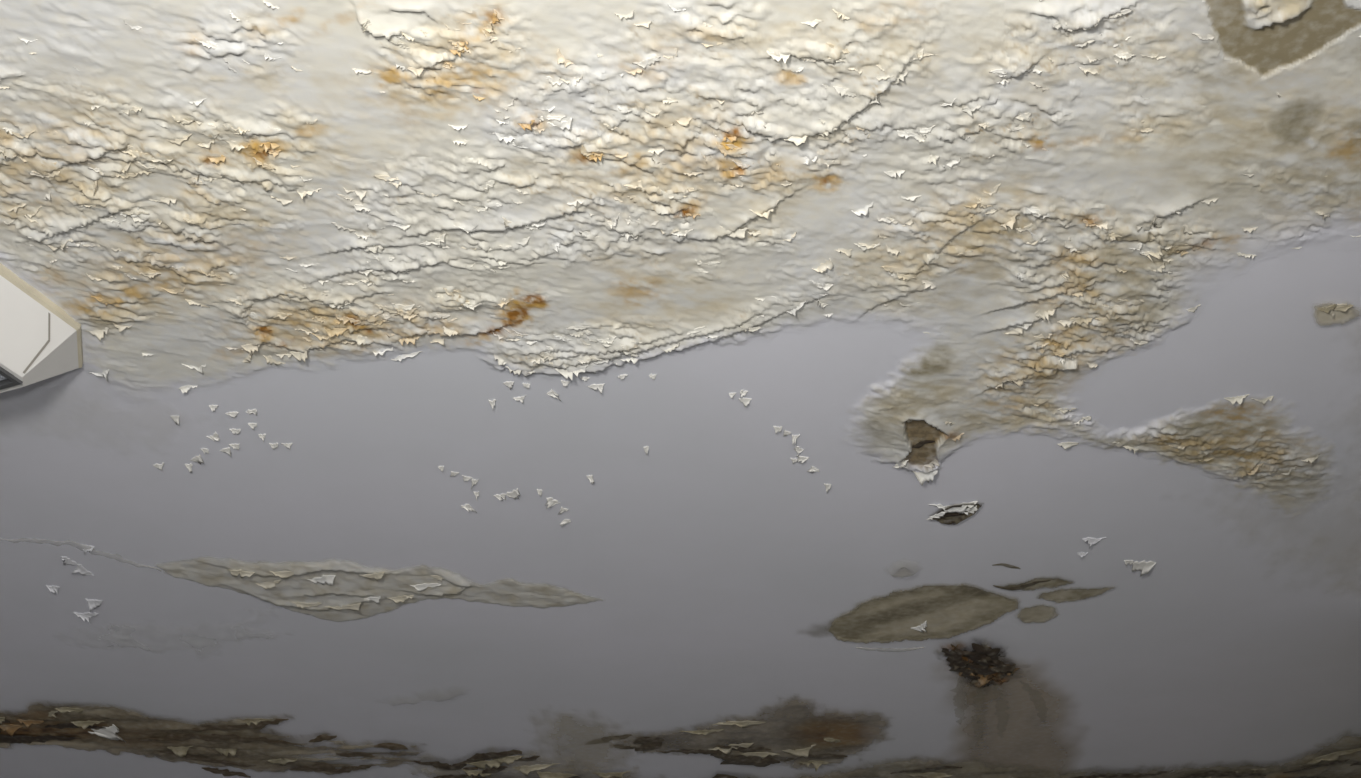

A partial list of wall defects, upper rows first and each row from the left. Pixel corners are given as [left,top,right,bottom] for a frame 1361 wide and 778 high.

rust [373,4,536,102]
rust [560,143,612,173]
rust [703,122,756,187]
rust [659,194,713,225]
peeling [0,0,1361,526]
rust [470,291,552,345]
spalling [926,501,982,525]
peeling [158,558,597,622]
spalling [829,578,1113,644]
leakage [942,643,1020,706]
spalling [0,703,631,778]
spalling [585,699,1361,778]